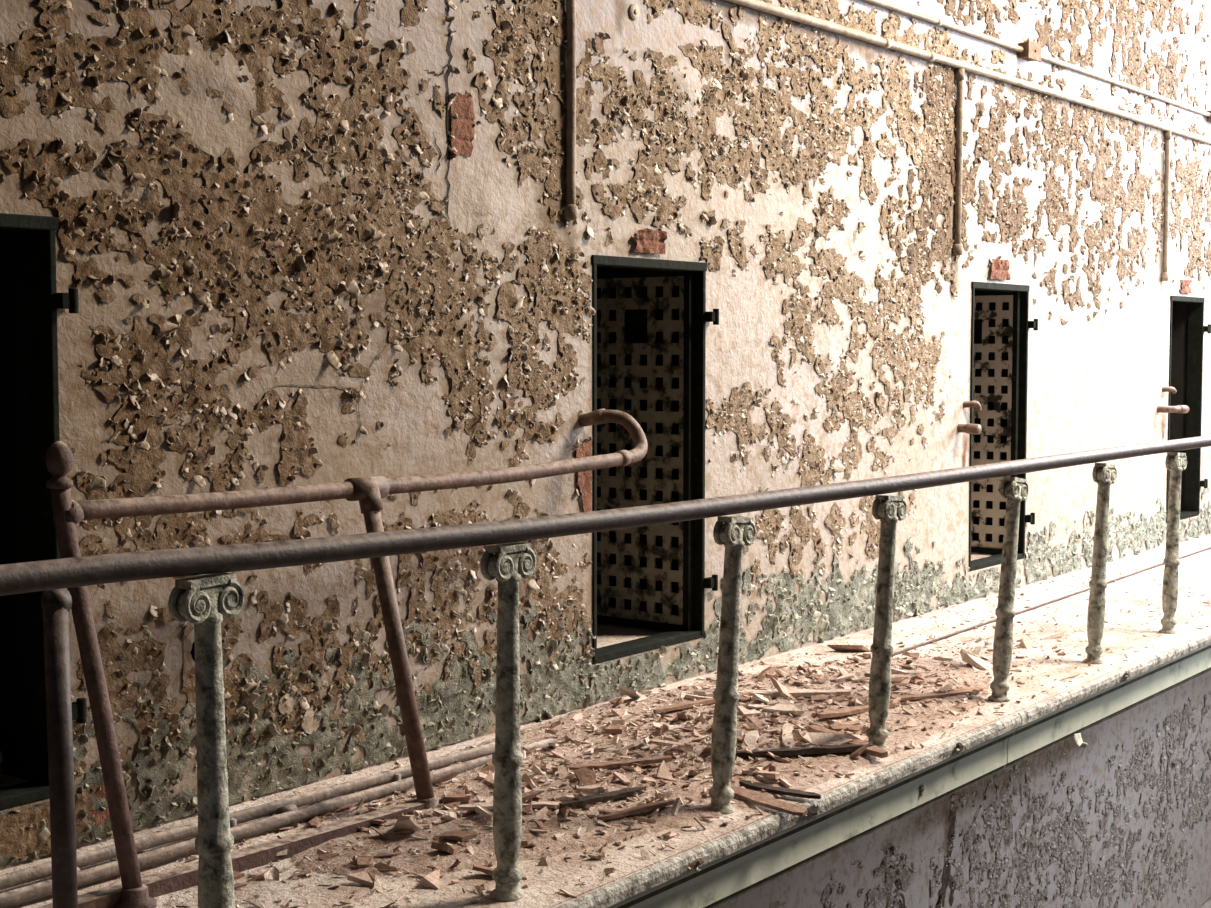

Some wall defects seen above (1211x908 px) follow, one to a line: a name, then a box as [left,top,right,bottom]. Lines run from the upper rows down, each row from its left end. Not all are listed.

peeling [80,500,340,557]
peeling [382,479,549,531]
spalling [572,437,593,512]
peeling [739,496,881,662]
peeling [900,489,917,519]
peeling [893,537,1000,622]
peeling [1016,487,1211,588]
peeling [97,584,198,830]
peeling [221,559,409,805]
peeling [397,538,723,750]